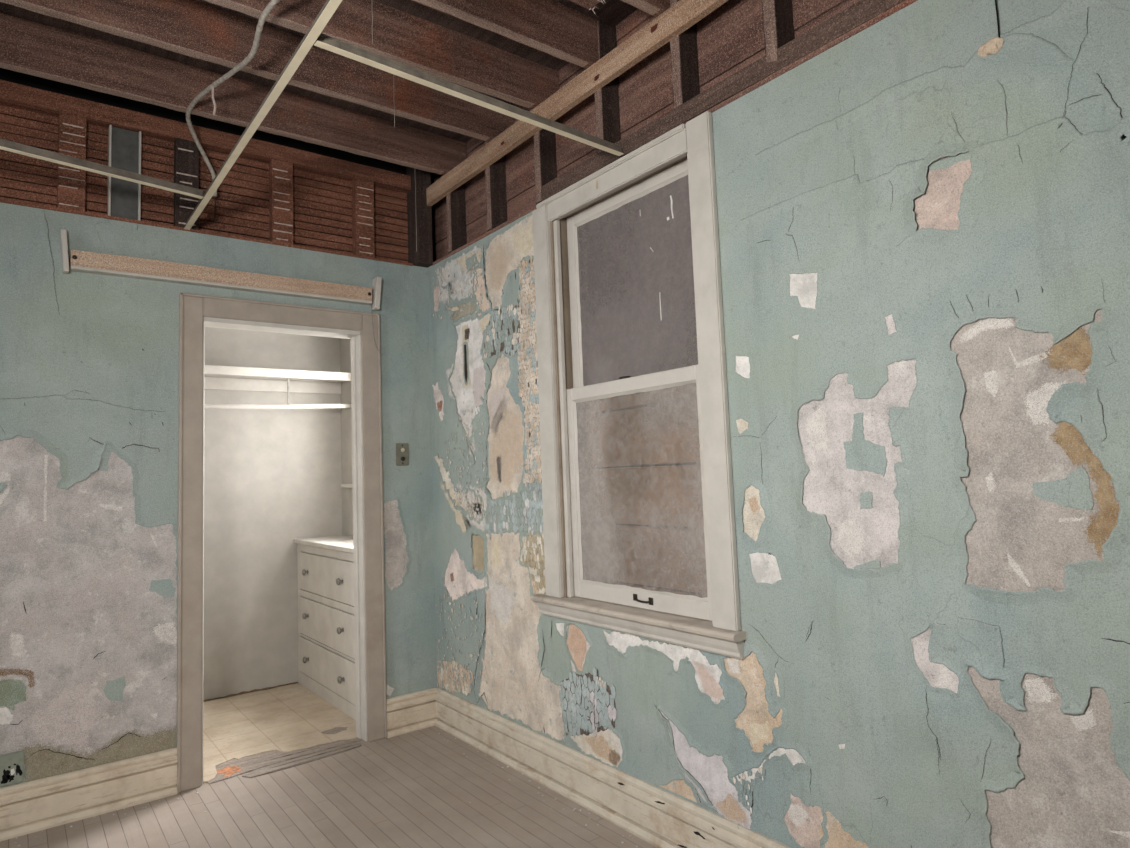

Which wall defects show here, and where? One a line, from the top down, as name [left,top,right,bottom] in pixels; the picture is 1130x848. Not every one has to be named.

crack [38,210,60,315]
peeling [901,115,1130,246]
peeling [0,429,178,784]
crack [86,414,164,471]
peeling [383,497,412,593]
peeling [432,209,812,839]
peeling [789,350,930,579]
peeling [941,301,1130,606]
peeling [903,617,1130,848]